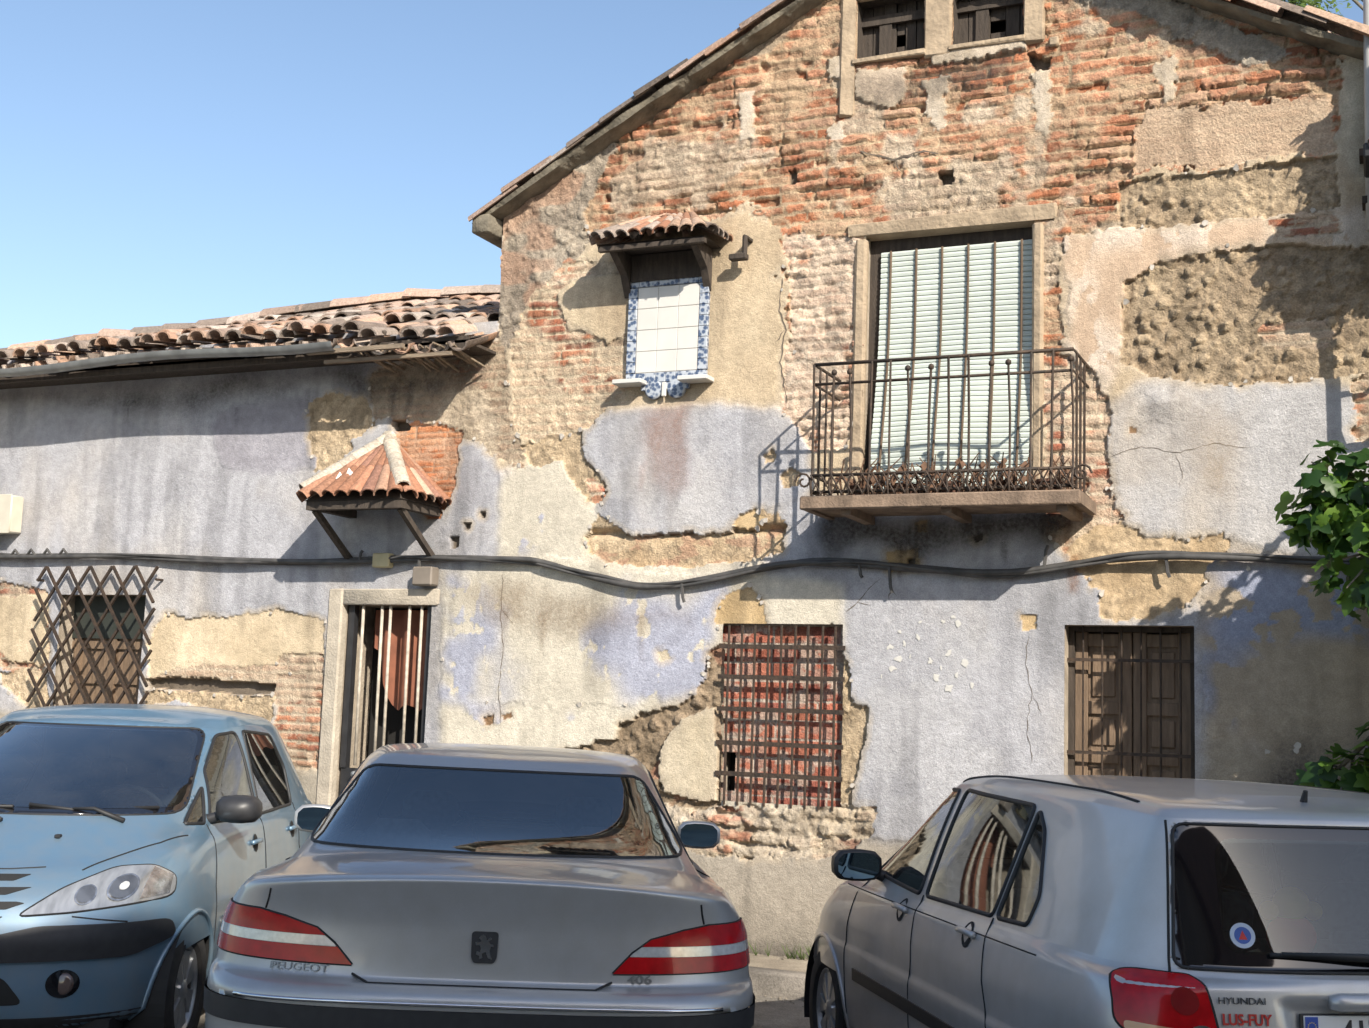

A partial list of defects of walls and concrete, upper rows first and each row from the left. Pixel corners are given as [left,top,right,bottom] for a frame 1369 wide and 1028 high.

flaking render [304,0,1369,861]
crack [1113,443,1249,484]
flaking render [0,577,50,708]
flaking render [145,609,327,771]
crack [1025,638,1041,755]